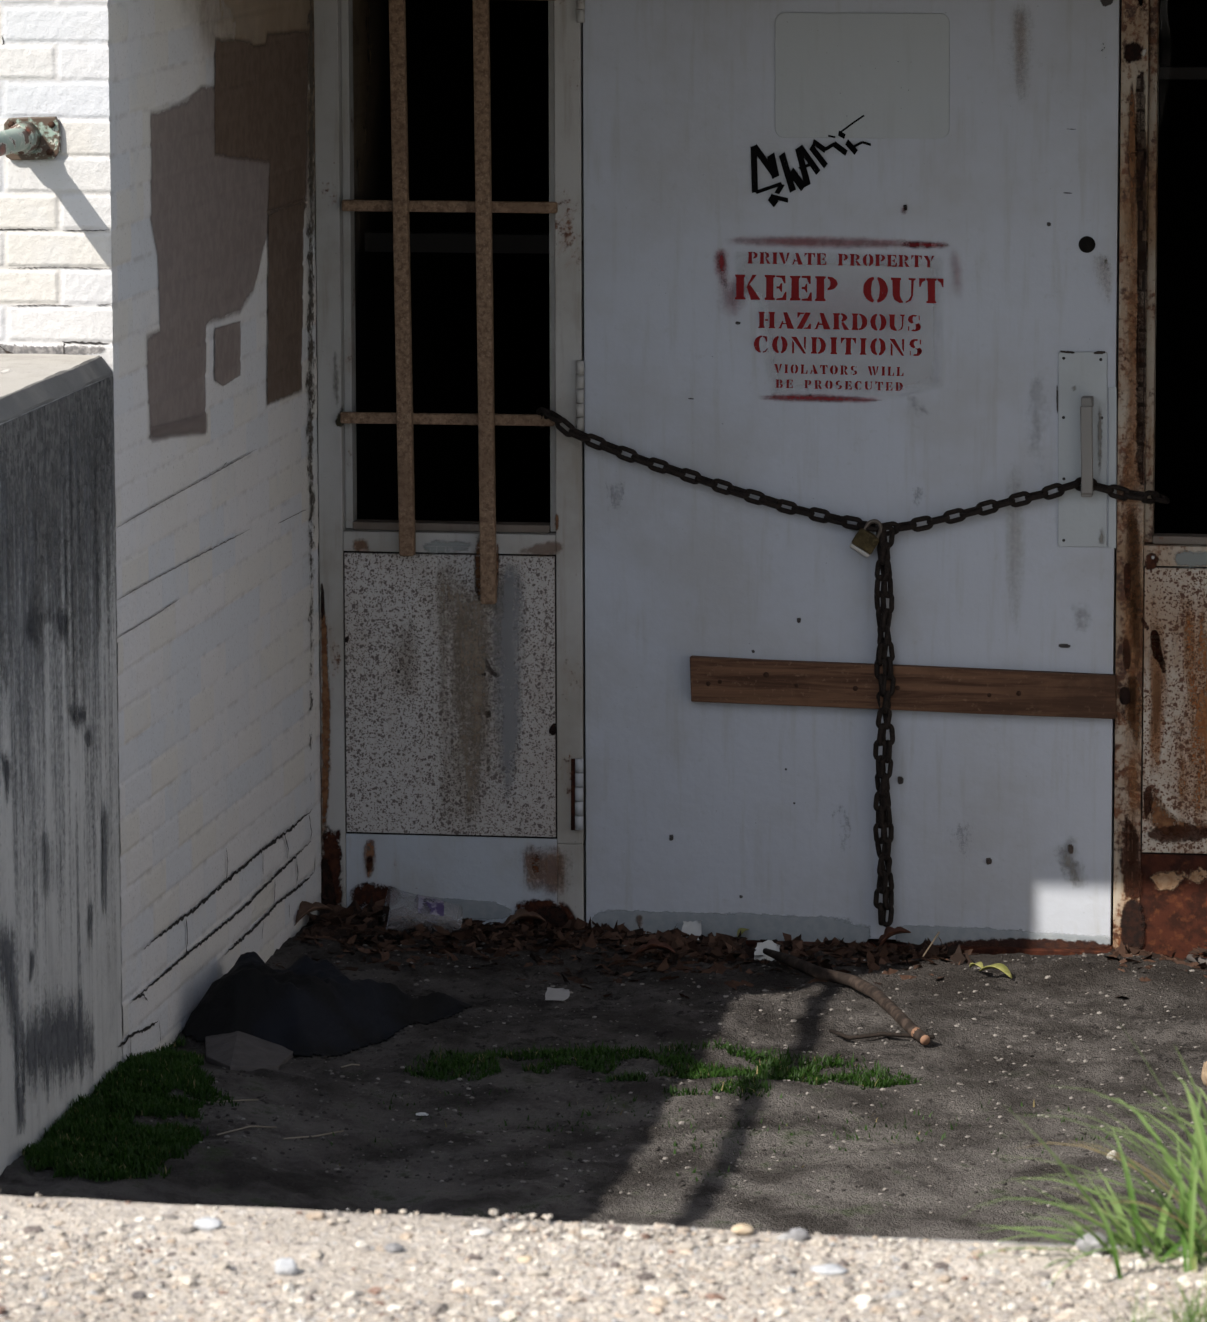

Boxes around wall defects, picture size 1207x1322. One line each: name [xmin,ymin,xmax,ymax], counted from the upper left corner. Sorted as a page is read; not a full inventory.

water stain [0,927,95,1133]
water stain [0,375,117,907]
water stain [78,808,109,972]
corrosion [321,583,401,908]
corrosion [513,846,576,929]
corrosion [940,71,1207,950]